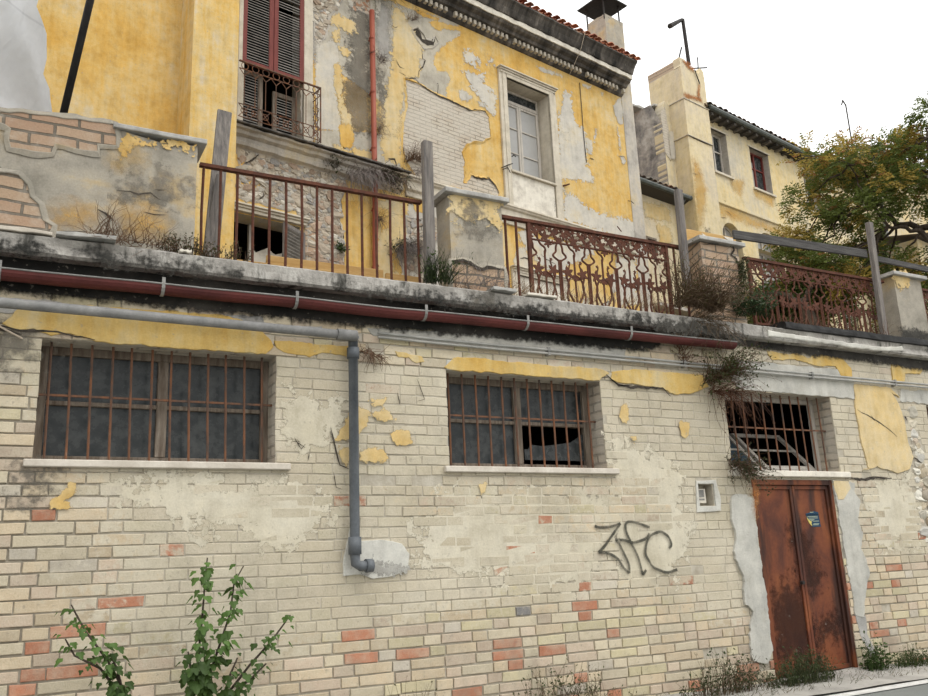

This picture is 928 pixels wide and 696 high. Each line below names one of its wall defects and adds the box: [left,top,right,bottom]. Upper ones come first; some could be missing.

spalling [0,167,58,237]
spalling [0,107,197,160]
spalling [235,0,595,291]
peeling [557,89,635,237]
flaking render [604,255,638,309]
rust [772,525,842,660]